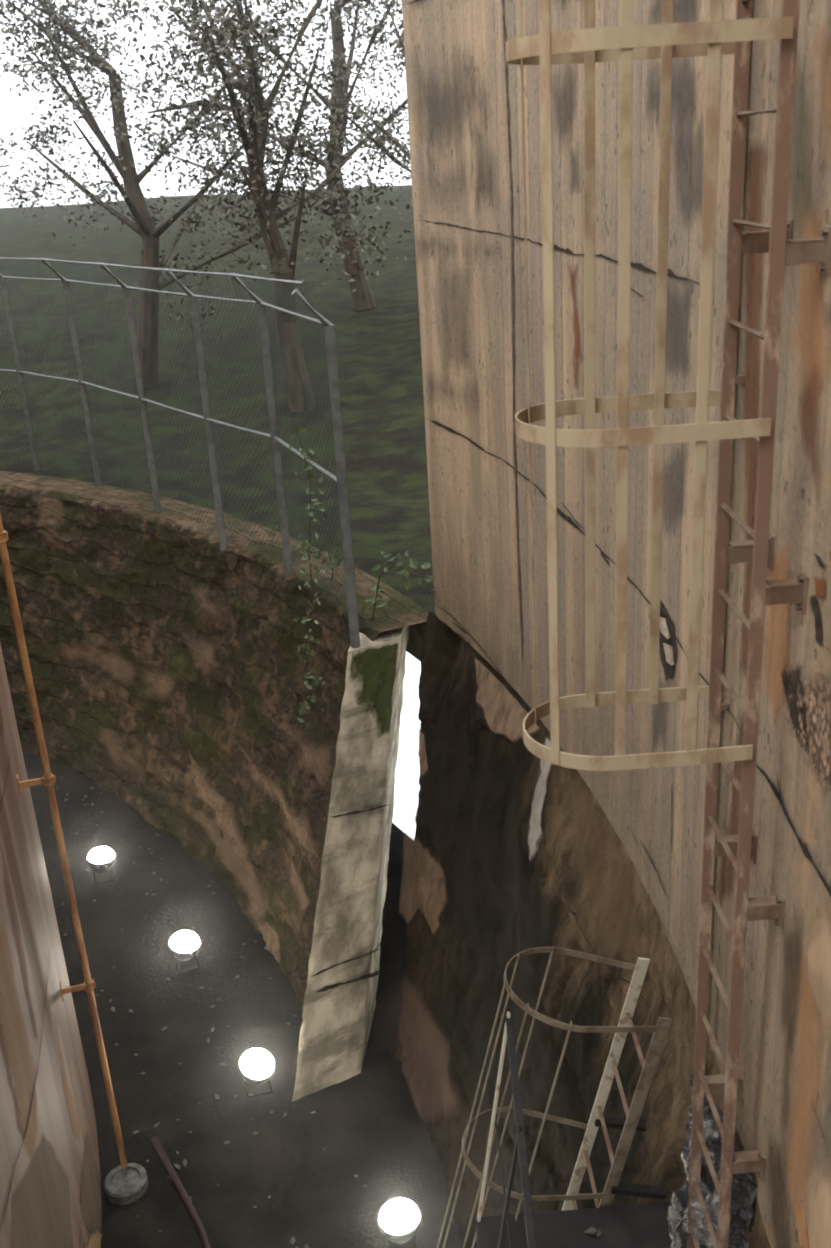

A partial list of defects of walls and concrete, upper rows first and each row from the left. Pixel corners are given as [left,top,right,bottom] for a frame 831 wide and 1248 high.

crack [417,0,743,735]
spalling [782,665,831,790]
crack [631,786,687,987]
crack [756,764,831,897]
crack [0,956,50,1231]